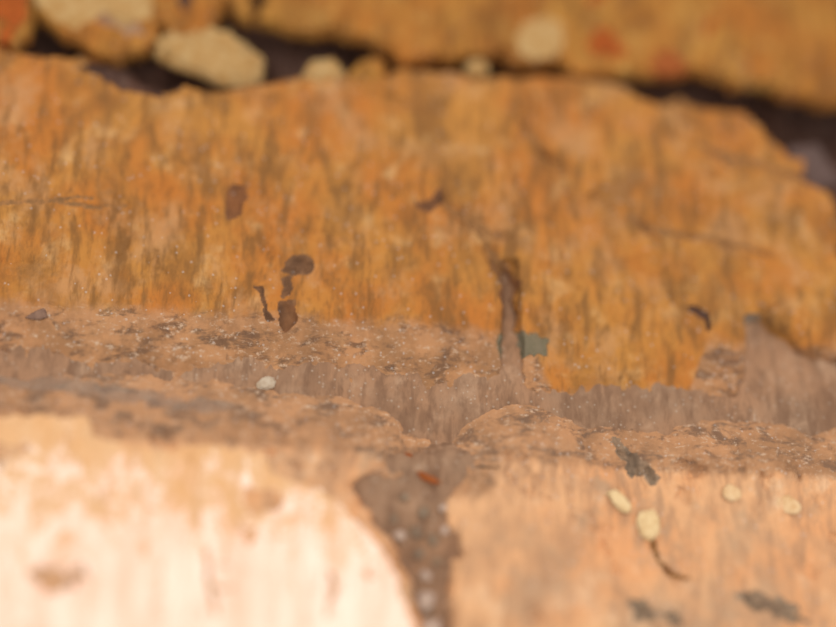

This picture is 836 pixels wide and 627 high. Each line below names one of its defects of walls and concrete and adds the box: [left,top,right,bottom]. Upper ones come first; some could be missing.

spalling [80,63,182,98]
spalling [300,57,386,82]
spalling [464,59,489,79]
peeling [785,144,836,190]
spalling [225,184,248,221]
spalling [415,187,444,213]
crack [442,199,507,285]